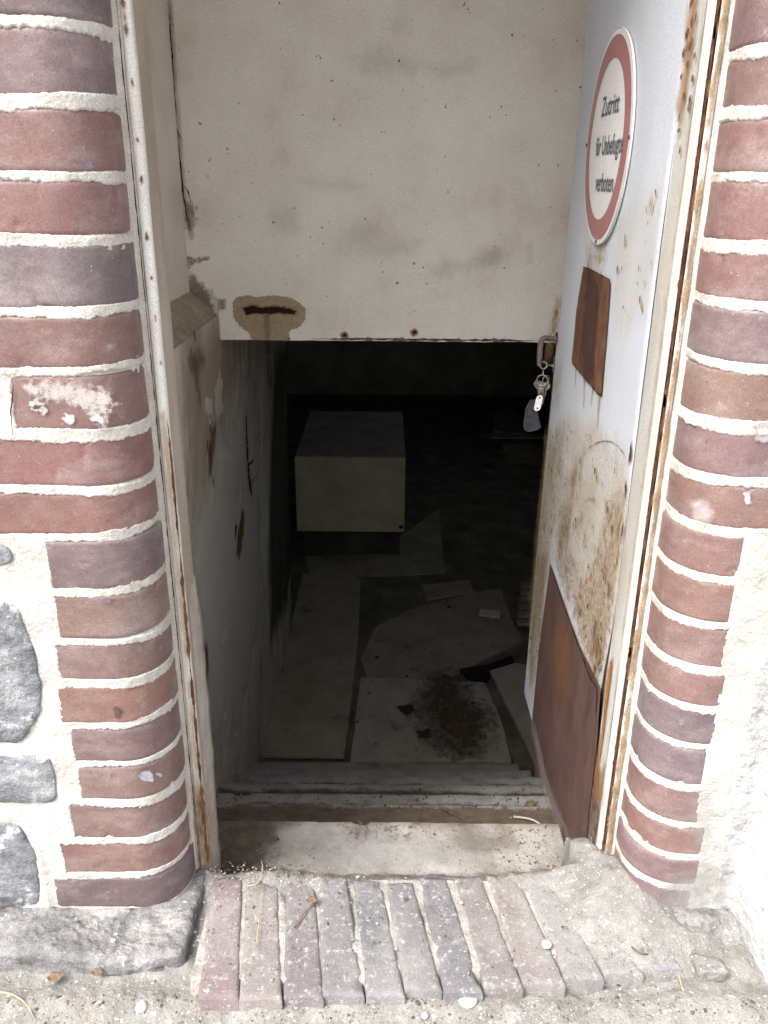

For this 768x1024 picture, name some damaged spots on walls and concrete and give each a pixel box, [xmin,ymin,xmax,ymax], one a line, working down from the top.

water stain [189,275,225,311]
spalling [233,296,305,340]
crack [246,416,255,496]
rust [528,0,729,853]
rust [235,510,244,559]
rust [167,419,210,869]